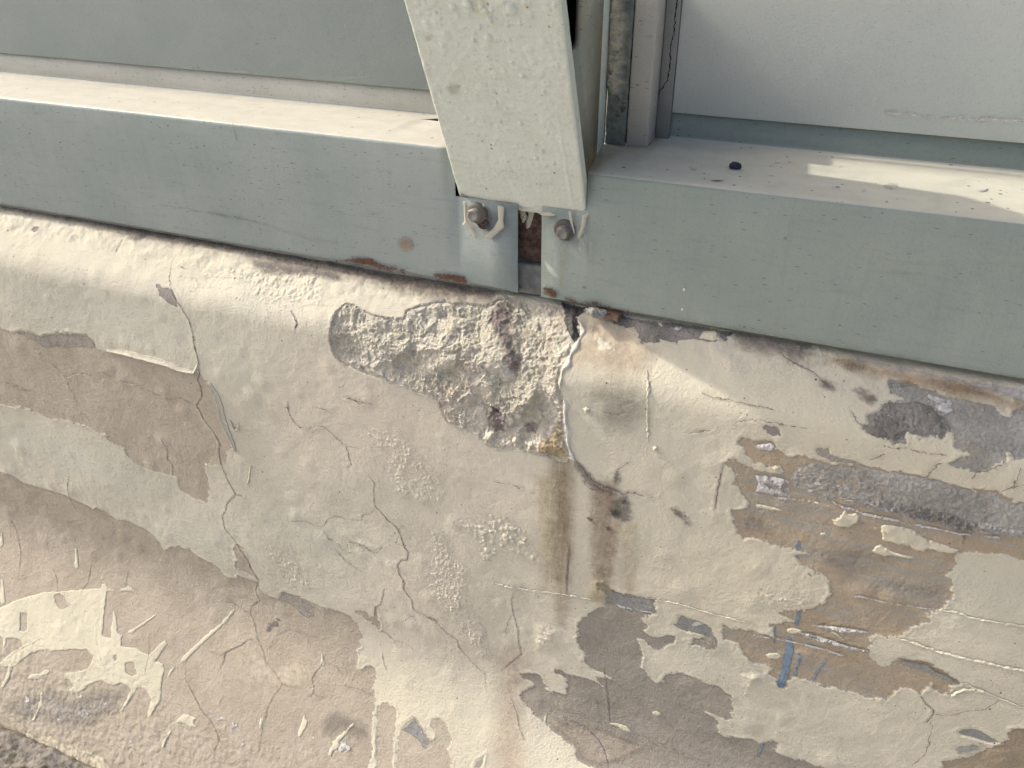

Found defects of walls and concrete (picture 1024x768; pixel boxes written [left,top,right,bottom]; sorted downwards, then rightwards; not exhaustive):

peeling [0,328,236,503]
crack [51,266,484,732]
spalling [328,296,588,463]
leakage [575,464,630,531]
peeling [862,379,1024,473]
peeling [0,472,452,768]
peeling [520,425,1024,768]